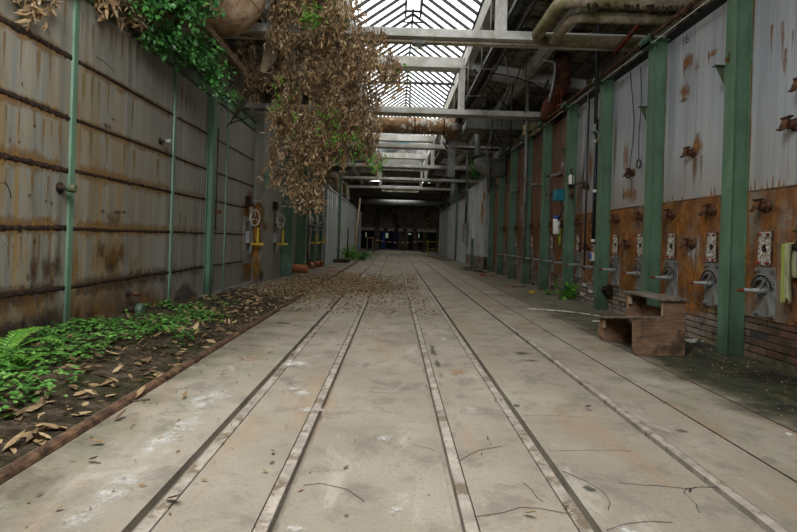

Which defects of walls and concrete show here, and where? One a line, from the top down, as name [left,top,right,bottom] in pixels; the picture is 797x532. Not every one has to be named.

corrosion [0,15,208,135]
corrosion [0,87,267,312]
crack [618,482,711,513]